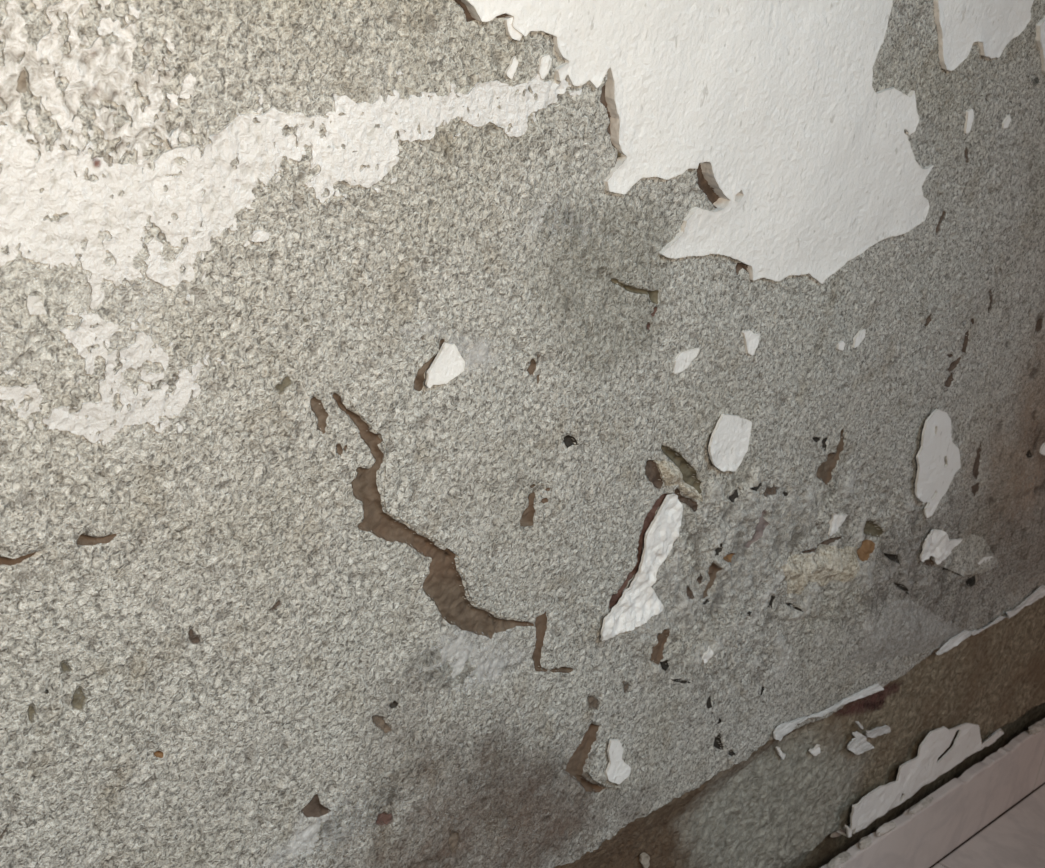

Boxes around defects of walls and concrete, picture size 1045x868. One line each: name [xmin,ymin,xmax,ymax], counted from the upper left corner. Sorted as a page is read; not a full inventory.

peeling [933,0,1045,75]
peeling [0,0,934,445]
flaking render [564,435,579,448]
peeling [600,445,702,641]
flaking render [686,510,769,605]
peeling [708,414,752,472]
flaking render [729,482,788,502]
flaking render [812,429,844,485]
peeling [828,513,847,536]
flaking render [857,520,884,562]
peeling [915,409,962,567]
flaking render [554,596,1045,868]